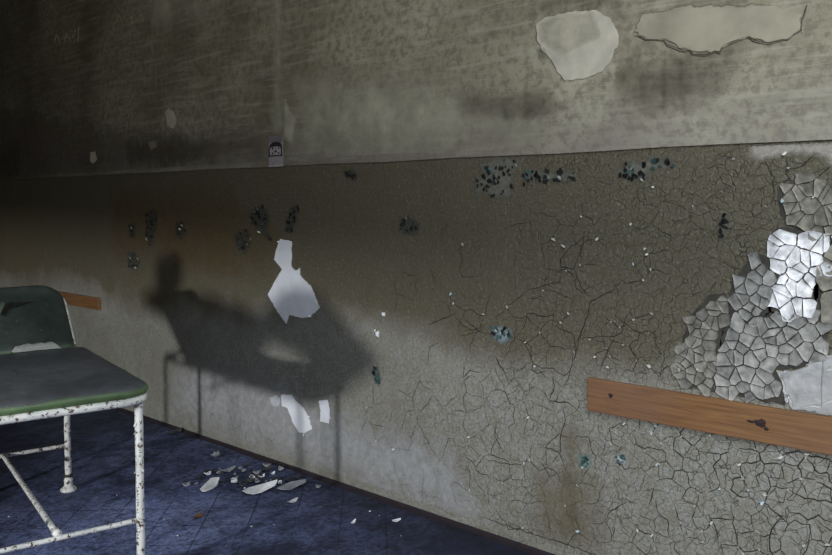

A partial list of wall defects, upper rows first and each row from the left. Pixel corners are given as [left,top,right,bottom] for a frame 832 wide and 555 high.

flaking render [536,10,620,81]
flaking render [634,3,807,56]
peeling [474,158,577,197]
peeling [235,205,320,324]
peeling [670,169,832,415]
crack [361,151,832,555]
peeling [269,394,331,436]